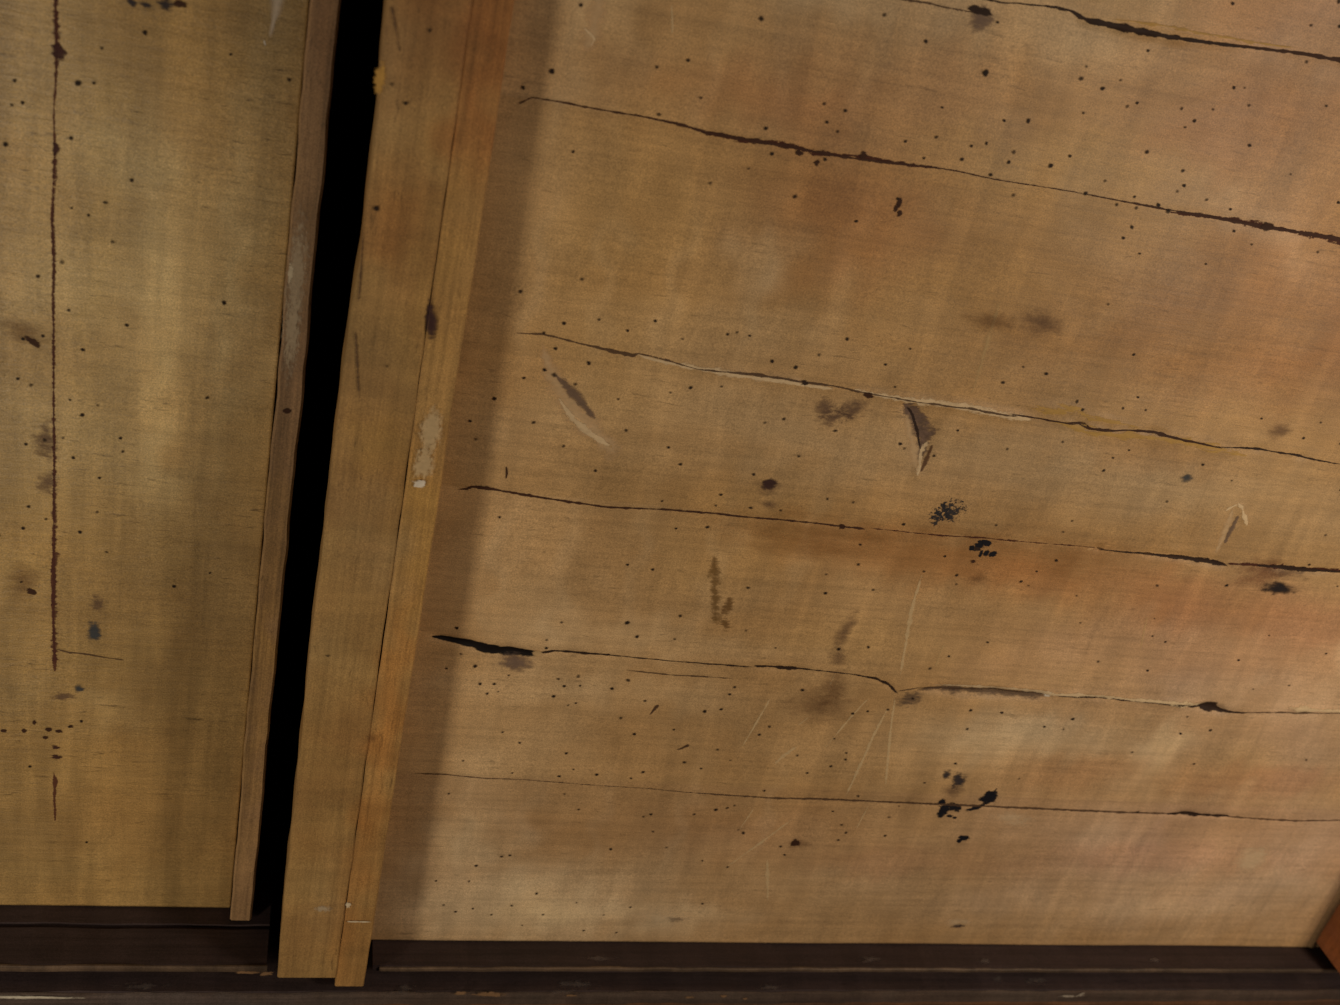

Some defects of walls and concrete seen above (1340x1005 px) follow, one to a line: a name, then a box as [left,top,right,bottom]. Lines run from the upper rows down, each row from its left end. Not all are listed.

crack [903,0,1340,63]
crack [515,97,1340,245]
crack [50,0,122,671]
crack [517,333,1338,464]
crack [459,486,1340,573]
crack [432,635,1340,714]
crack [52,746,62,820]
crack [418,773,1340,822]